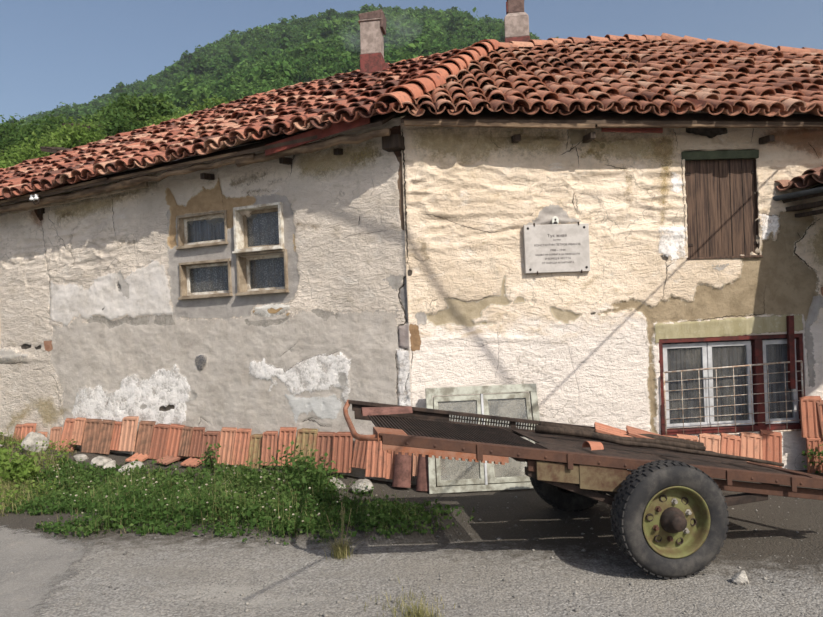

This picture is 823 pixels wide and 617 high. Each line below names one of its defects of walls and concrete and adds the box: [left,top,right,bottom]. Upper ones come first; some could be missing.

spalling [165,178,256,249]
peeling [21,270,533,460]
crack [343,132,515,404]
crack [434,331,580,401]
spalling [550,209,823,434]